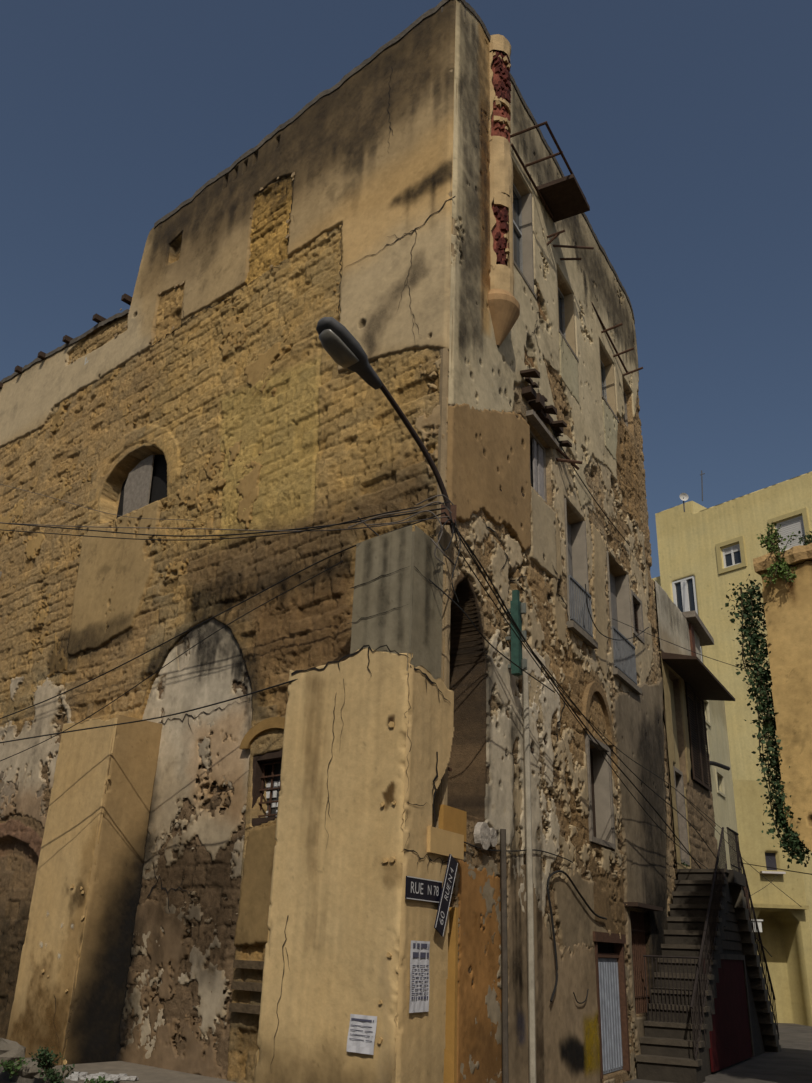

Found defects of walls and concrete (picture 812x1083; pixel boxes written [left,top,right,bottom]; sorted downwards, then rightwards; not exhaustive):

crack [338,195,456,339]
crack [351,566,442,590]
crack [291,606,448,872]
peeling [451,352,654,1045]
peeling [230,805,246,879]
peeling [126,807,232,1059]
crack [271,915,290,1063]
peeling [625,957,637,1080]